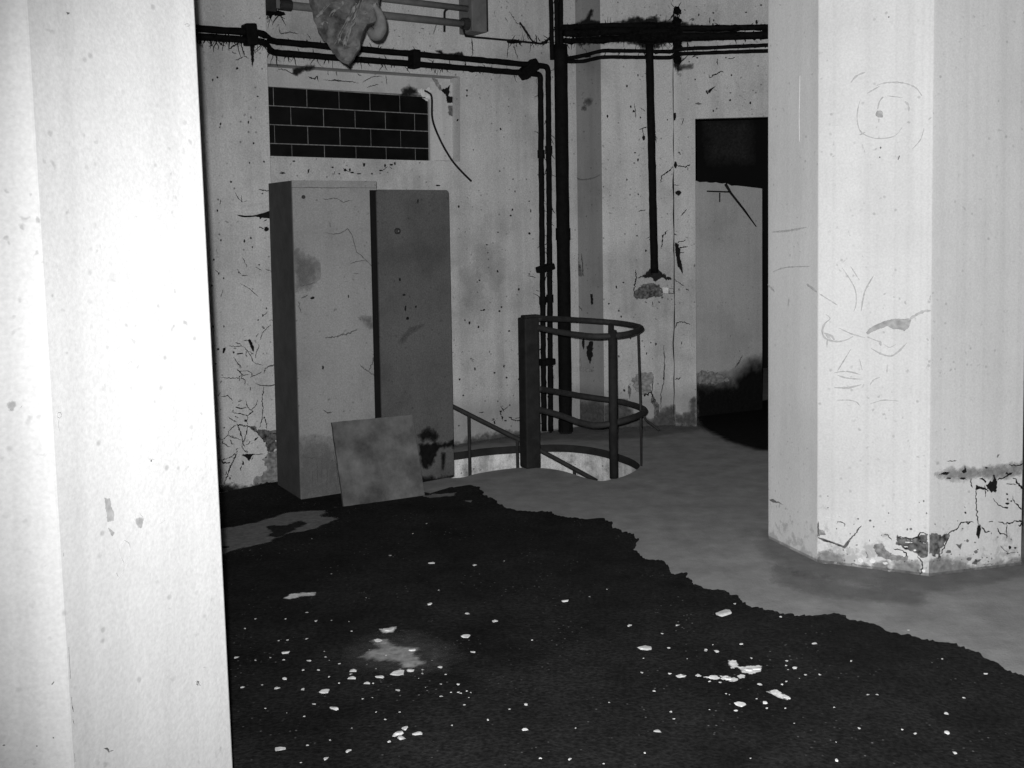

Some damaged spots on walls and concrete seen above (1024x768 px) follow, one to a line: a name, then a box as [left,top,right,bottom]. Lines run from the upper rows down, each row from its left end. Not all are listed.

flaking render [616,270,674,305]
crack [217,365,274,483]
flaking render [229,420,278,484]
flaking render [817,475,1020,575]
crack [948,463,1023,537]